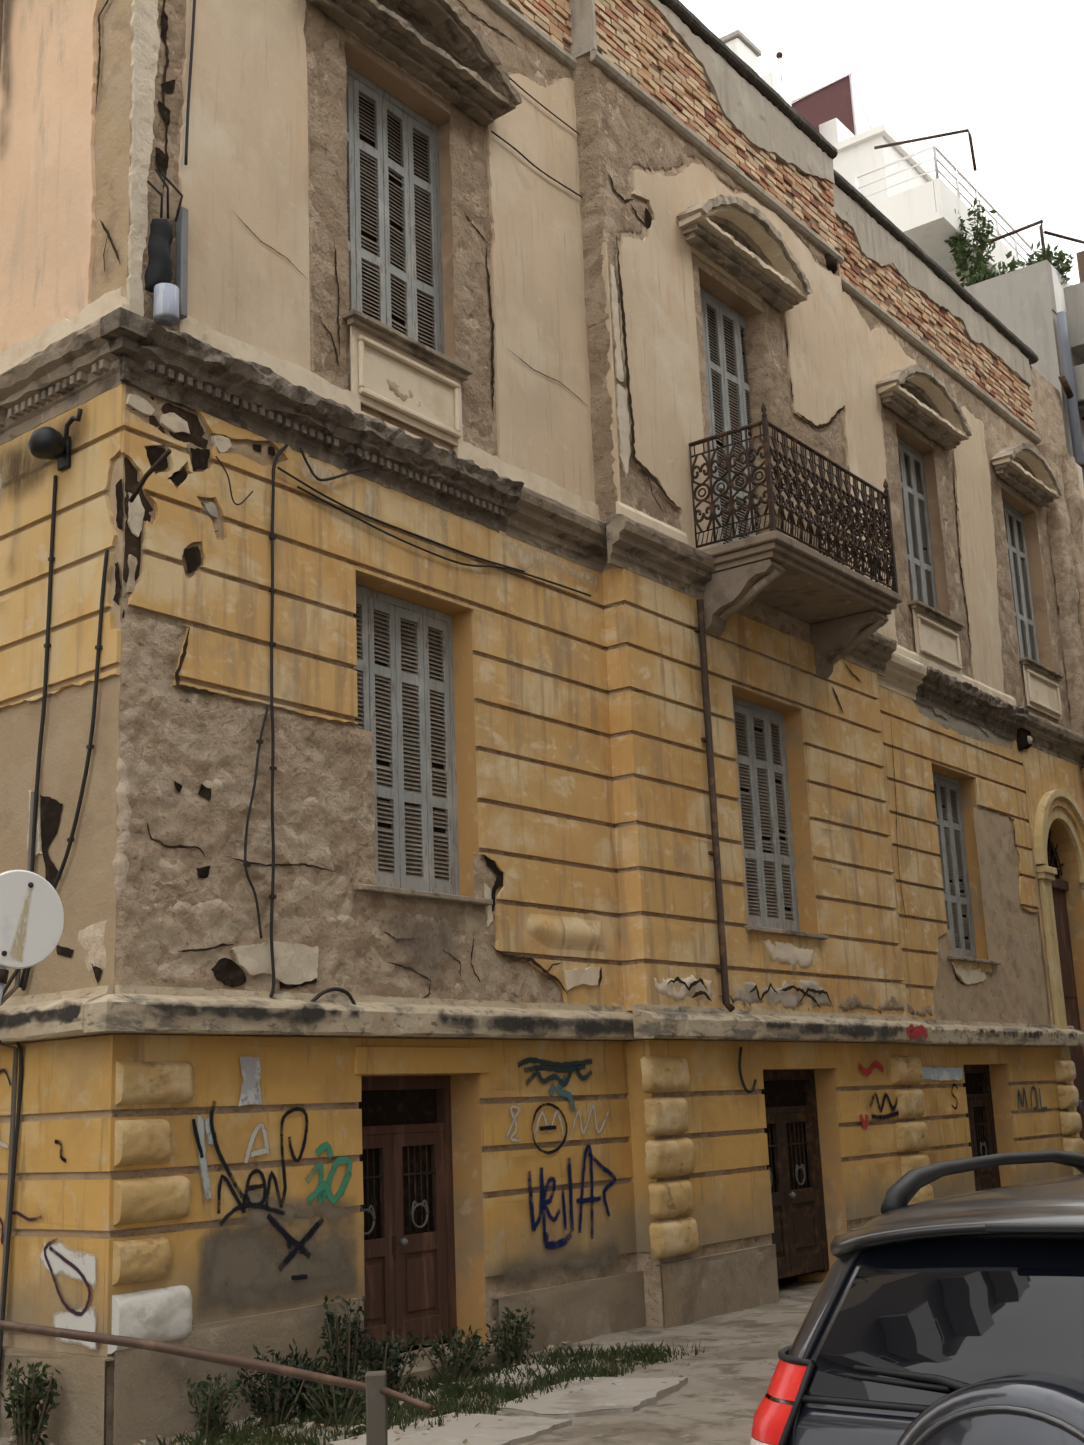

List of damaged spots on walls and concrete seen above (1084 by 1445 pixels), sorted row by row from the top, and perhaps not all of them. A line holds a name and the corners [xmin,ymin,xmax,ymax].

spalling [94,0,186,327]
spalling [303,0,350,391]
spalling [387,379,421,407]
spalling [450,0,774,529]
spalling [743,301,848,564]
spalling [788,224,1023,706]
spalling [0,394,602,1003]
spalling [654,807,1055,1025]